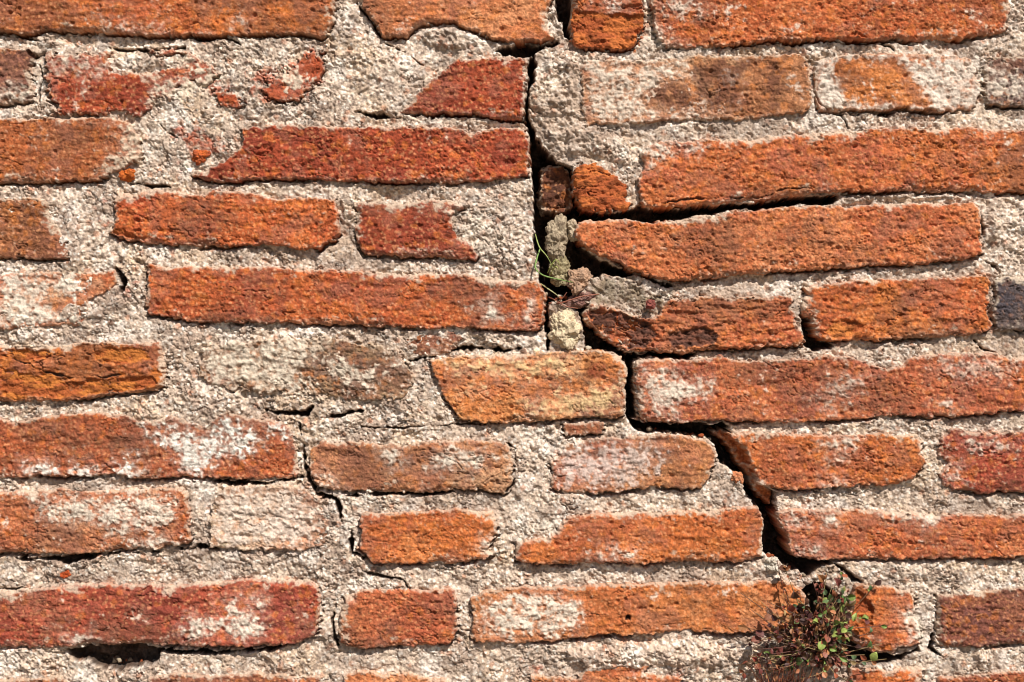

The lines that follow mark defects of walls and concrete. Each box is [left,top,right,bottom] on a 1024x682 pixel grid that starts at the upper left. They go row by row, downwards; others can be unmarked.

crack [354,110,445,120]
crack [837,108,941,129]
crack [408,0,895,619]
crack [212,405,486,589]
crack [330,603,340,646]
crack [817,625,941,669]